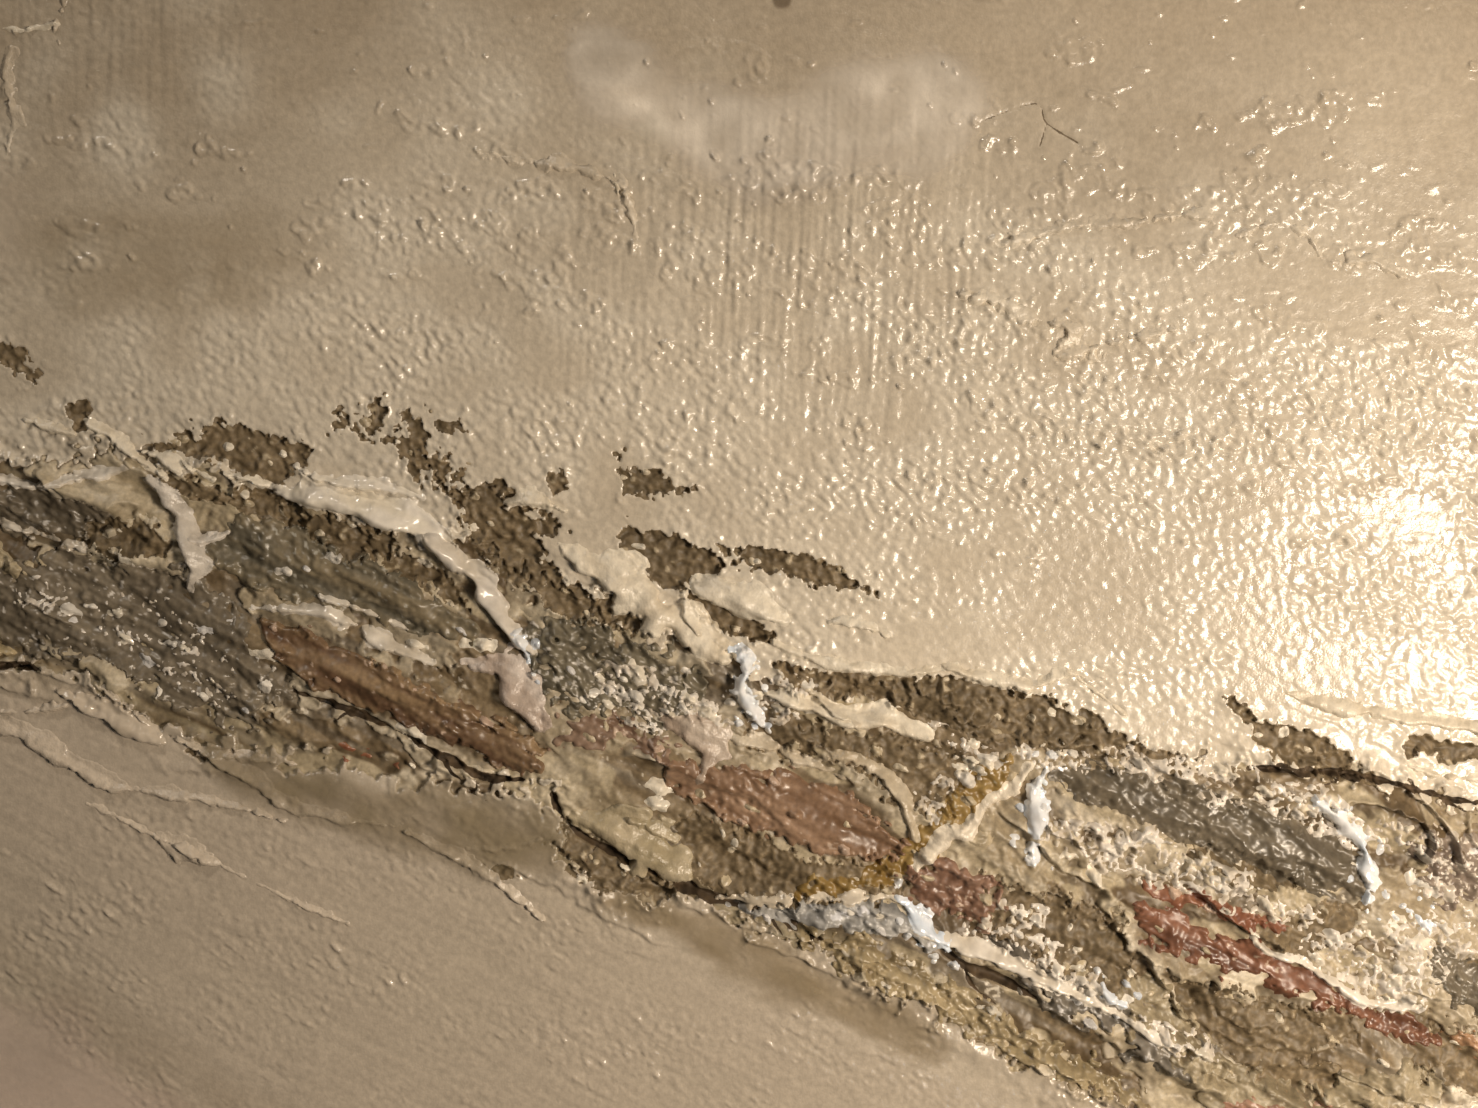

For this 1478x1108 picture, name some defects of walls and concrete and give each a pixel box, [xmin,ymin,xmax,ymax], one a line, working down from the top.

peeling [0,342,44,385]
rust [259,618,1009,934]
spalling [0,391,1478,1108]
rust [1126,875,1478,1059]